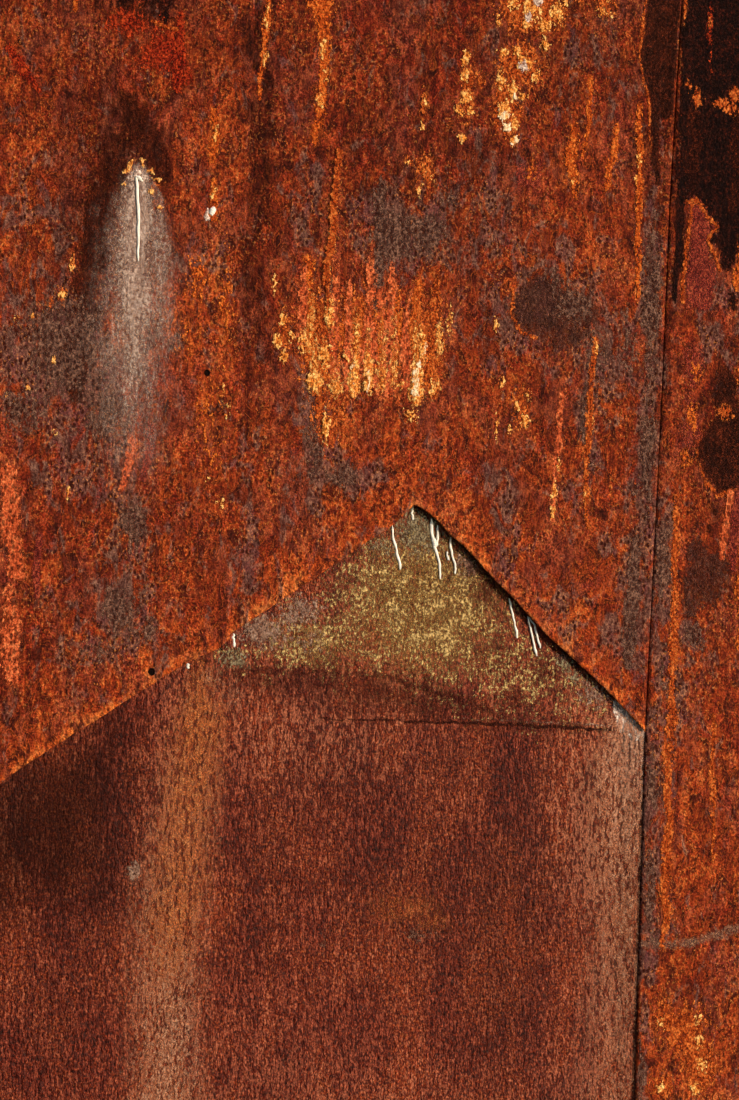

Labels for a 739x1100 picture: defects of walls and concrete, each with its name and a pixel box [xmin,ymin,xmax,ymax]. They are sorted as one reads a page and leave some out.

leakage [93,0,187,29]
leakage [123,169,151,356]
corrosion [680,199,690,245]
leakage [503,0,739,670]
corrosion [183,688,212,791]
corrosion [659,500,681,949]
corrosion [708,714,717,863]
corrosion [652,1073,673,1100]
corrosion [655,999,717,1096]